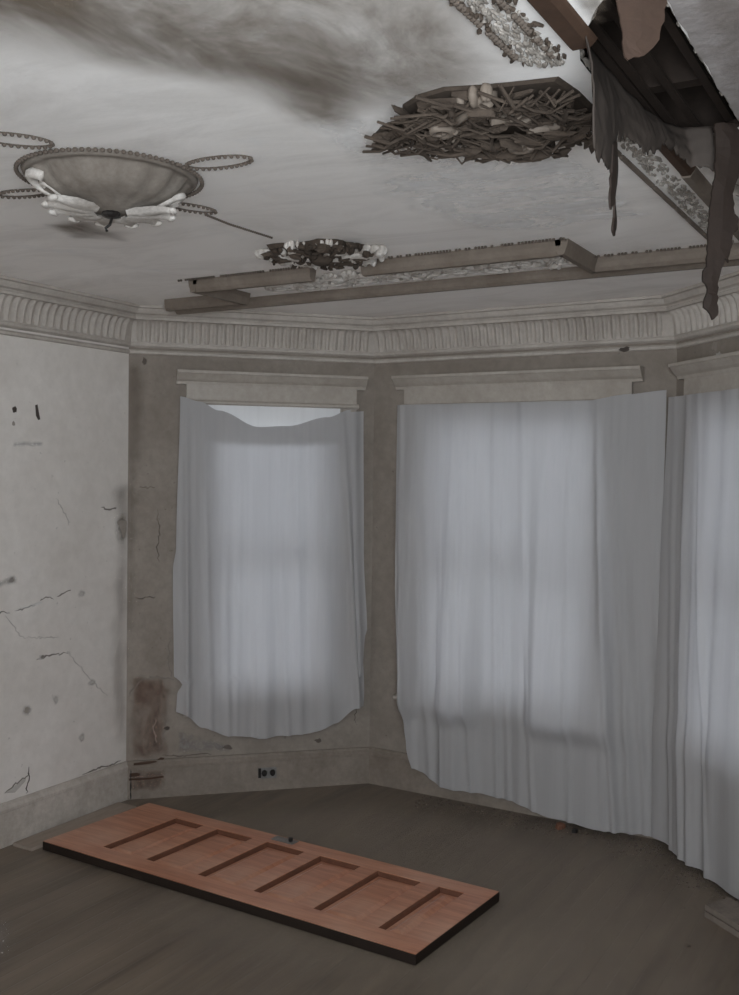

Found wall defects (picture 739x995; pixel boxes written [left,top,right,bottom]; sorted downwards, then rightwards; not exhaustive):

damp [0,0,123,35]
damp [135,0,370,93]
damp [386,10,455,89]
crack [0,590,108,696]